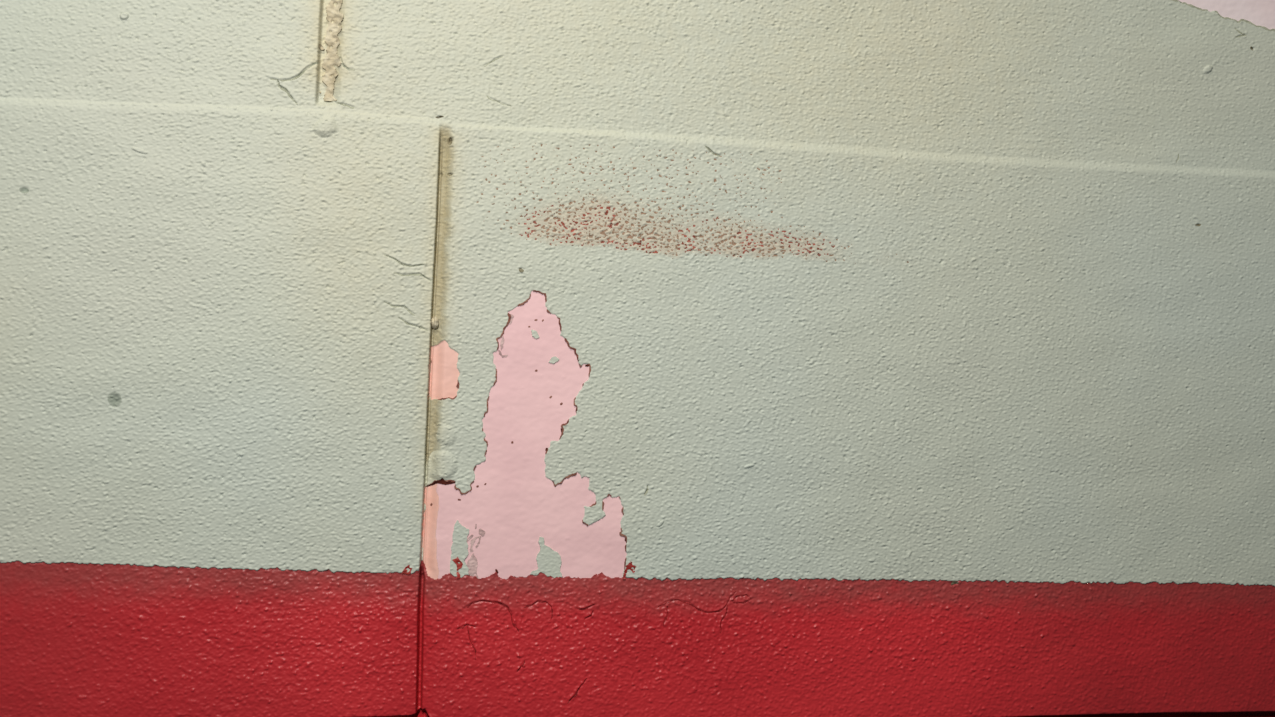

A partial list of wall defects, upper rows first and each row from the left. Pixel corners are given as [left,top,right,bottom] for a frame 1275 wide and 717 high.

peeling [422,290,627,580]